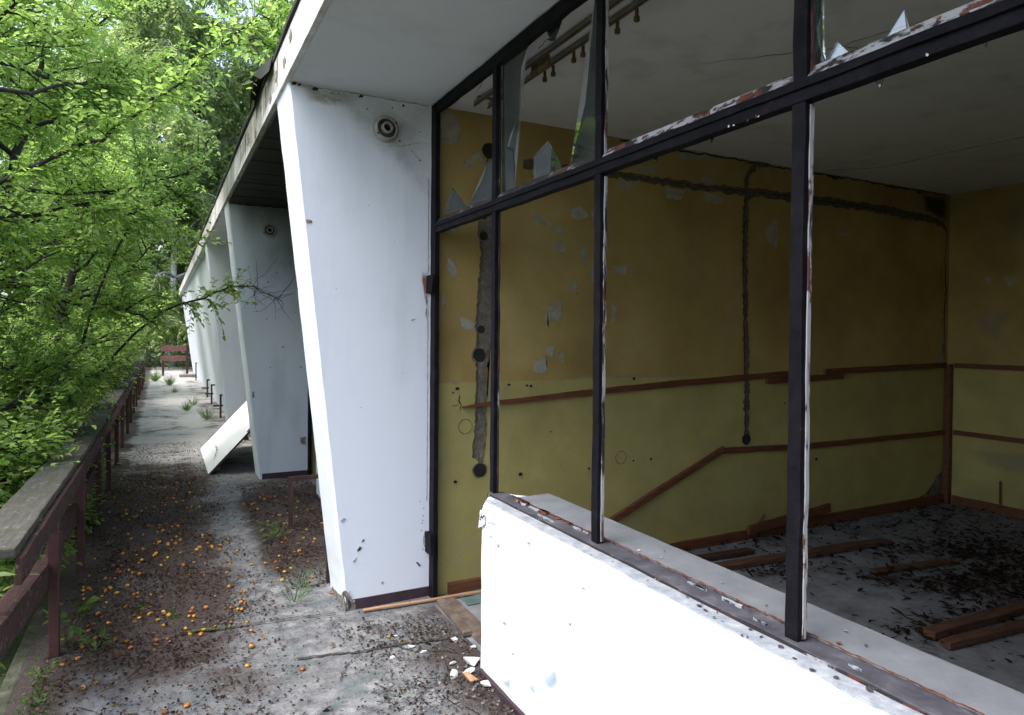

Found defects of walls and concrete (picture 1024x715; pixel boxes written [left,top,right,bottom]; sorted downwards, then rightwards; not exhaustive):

rust [512,495,591,533]
rust [604,537,785,623]
rust [806,631,985,715]